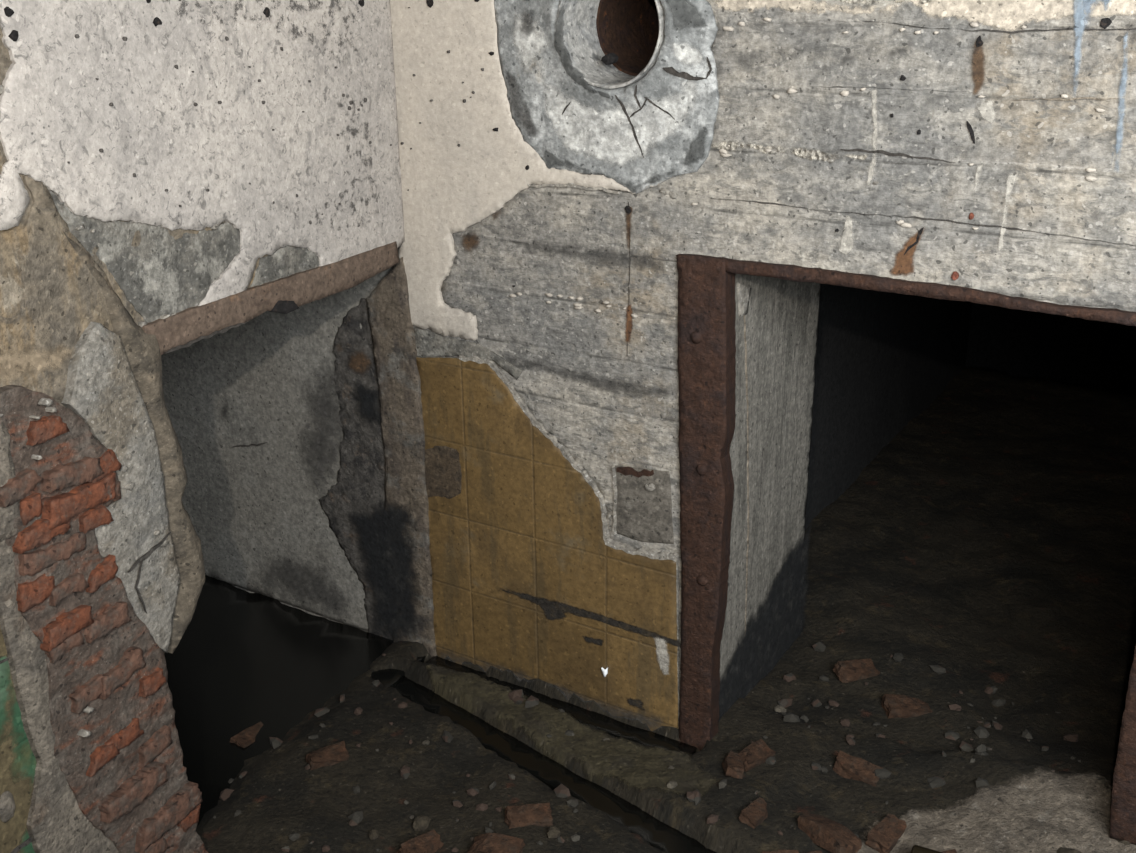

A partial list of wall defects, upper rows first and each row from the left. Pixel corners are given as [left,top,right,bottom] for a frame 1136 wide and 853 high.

peeling [0,28,12,96]
crack [662,57,712,81]
crack [615,85,673,158]
peeling [416,0,1136,558]
rust [891,227,924,275]
spalling [0,176,240,853]